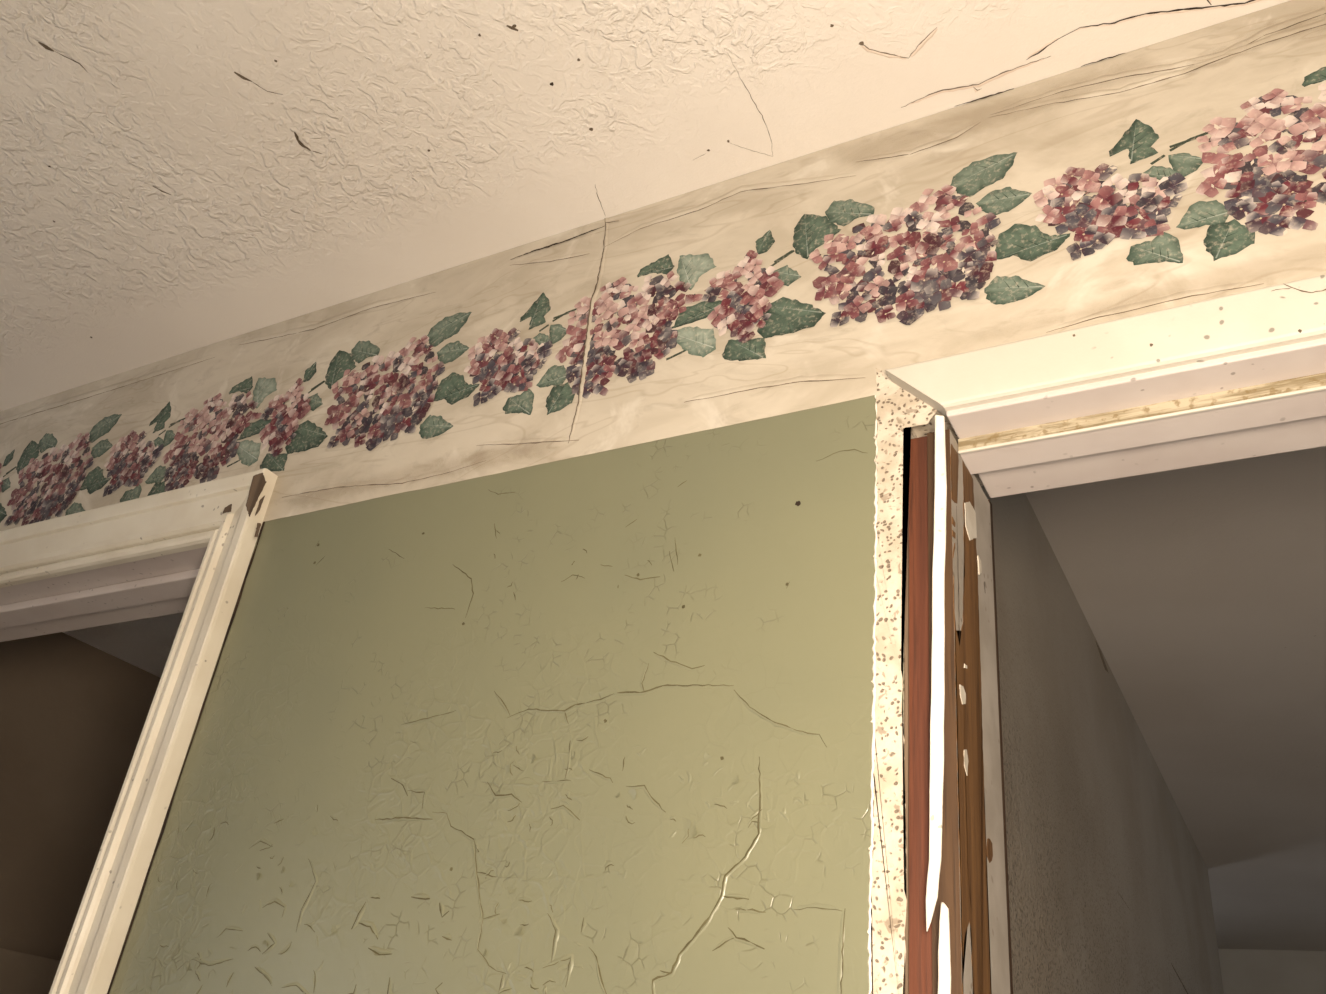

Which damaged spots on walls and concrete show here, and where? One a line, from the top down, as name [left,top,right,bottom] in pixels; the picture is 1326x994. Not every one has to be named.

crack [901,0,1262,108]
crack [1272,284,1326,293]
crack [425,566,474,618]
crack [561,543,678,582]
crack [487,652,827,820]
flaking render [867,368,937,994]
peeling [950,444,993,994]
crack [375,778,512,994]
crack [543,913,607,994]
crack [652,757,845,994]